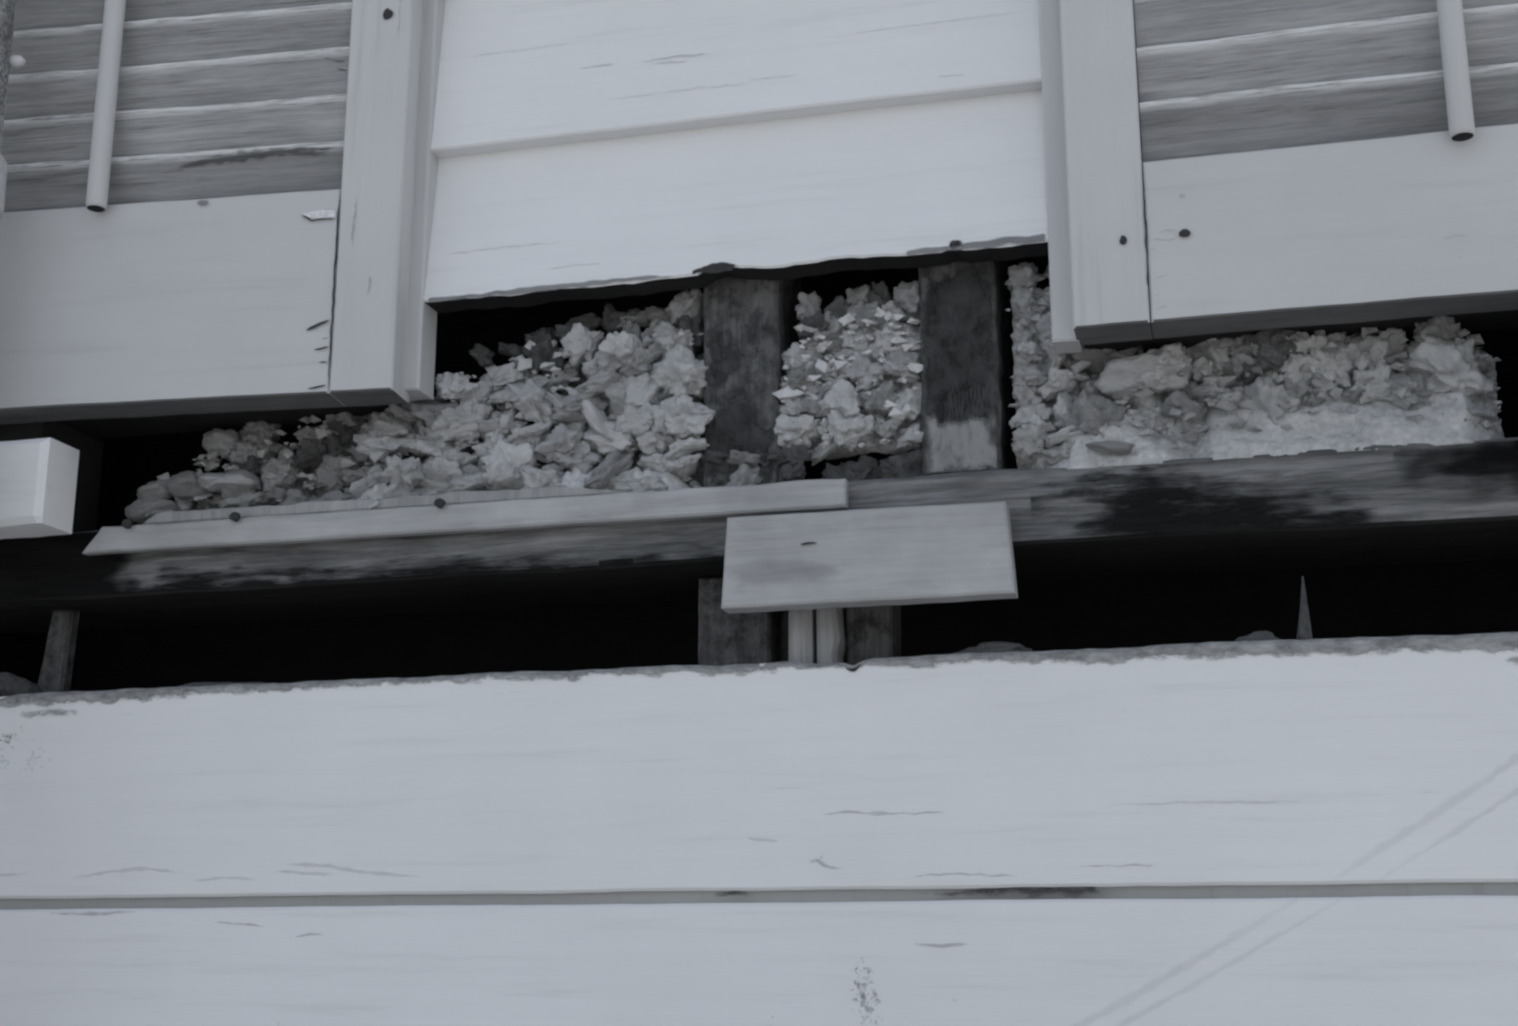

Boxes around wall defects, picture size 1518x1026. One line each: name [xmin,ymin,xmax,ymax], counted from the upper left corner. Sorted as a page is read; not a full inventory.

peeling [428,275,663,302]
spalling [1085,441,1135,455]
damp [1057,465,1369,539]
peeling [0,632,1518,717]